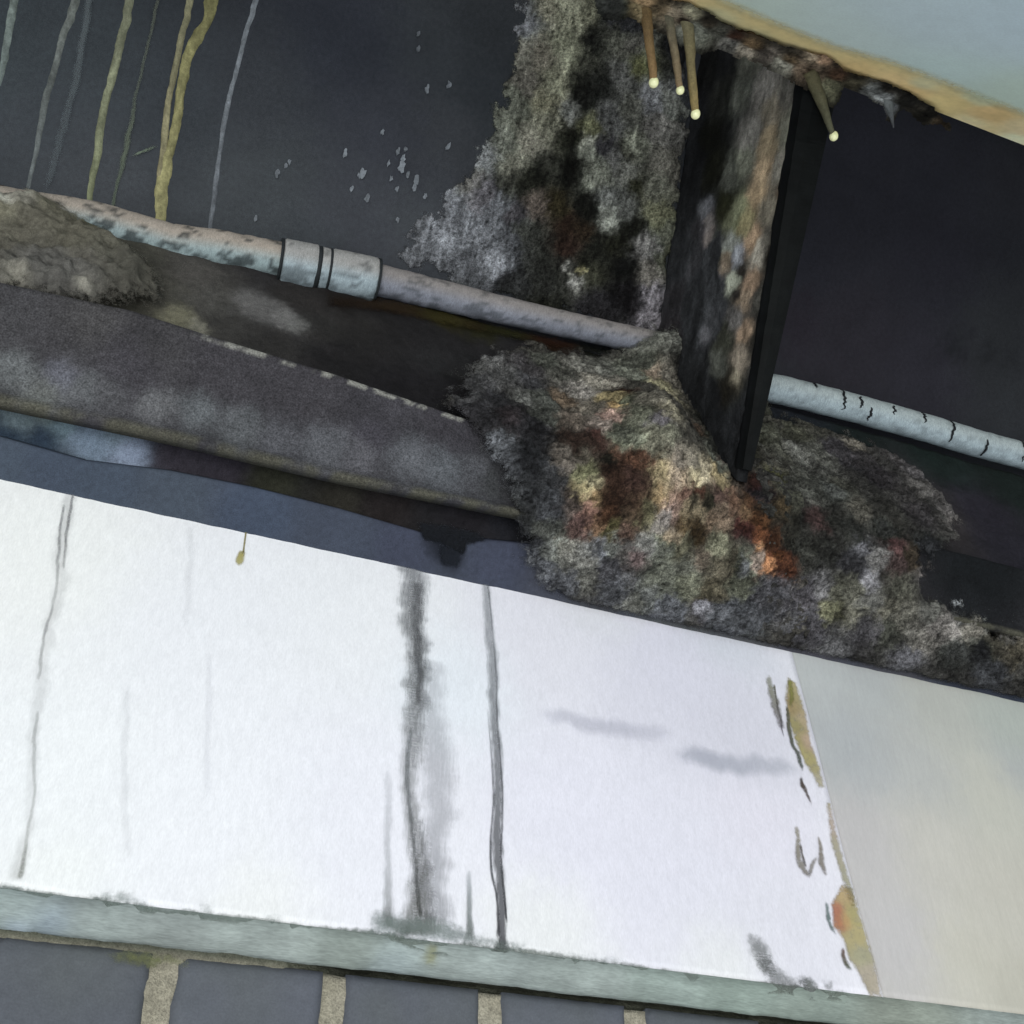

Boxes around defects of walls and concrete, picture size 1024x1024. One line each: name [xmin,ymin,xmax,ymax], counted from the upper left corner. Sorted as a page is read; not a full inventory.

leakage [26,0,91,189]
leakage [87,0,134,201]
leakage [112,0,218,221]
leakage [208,0,259,228]
leakage [397,0,952,330]
rust [332,298,1024,698]
crack [813,382,956,442]
leakage [135,906,271,923]
leakage [401,566,427,726]
leakage [326,600,581,962]
peeling [768,678,811,802]
peeling [796,829,826,876]